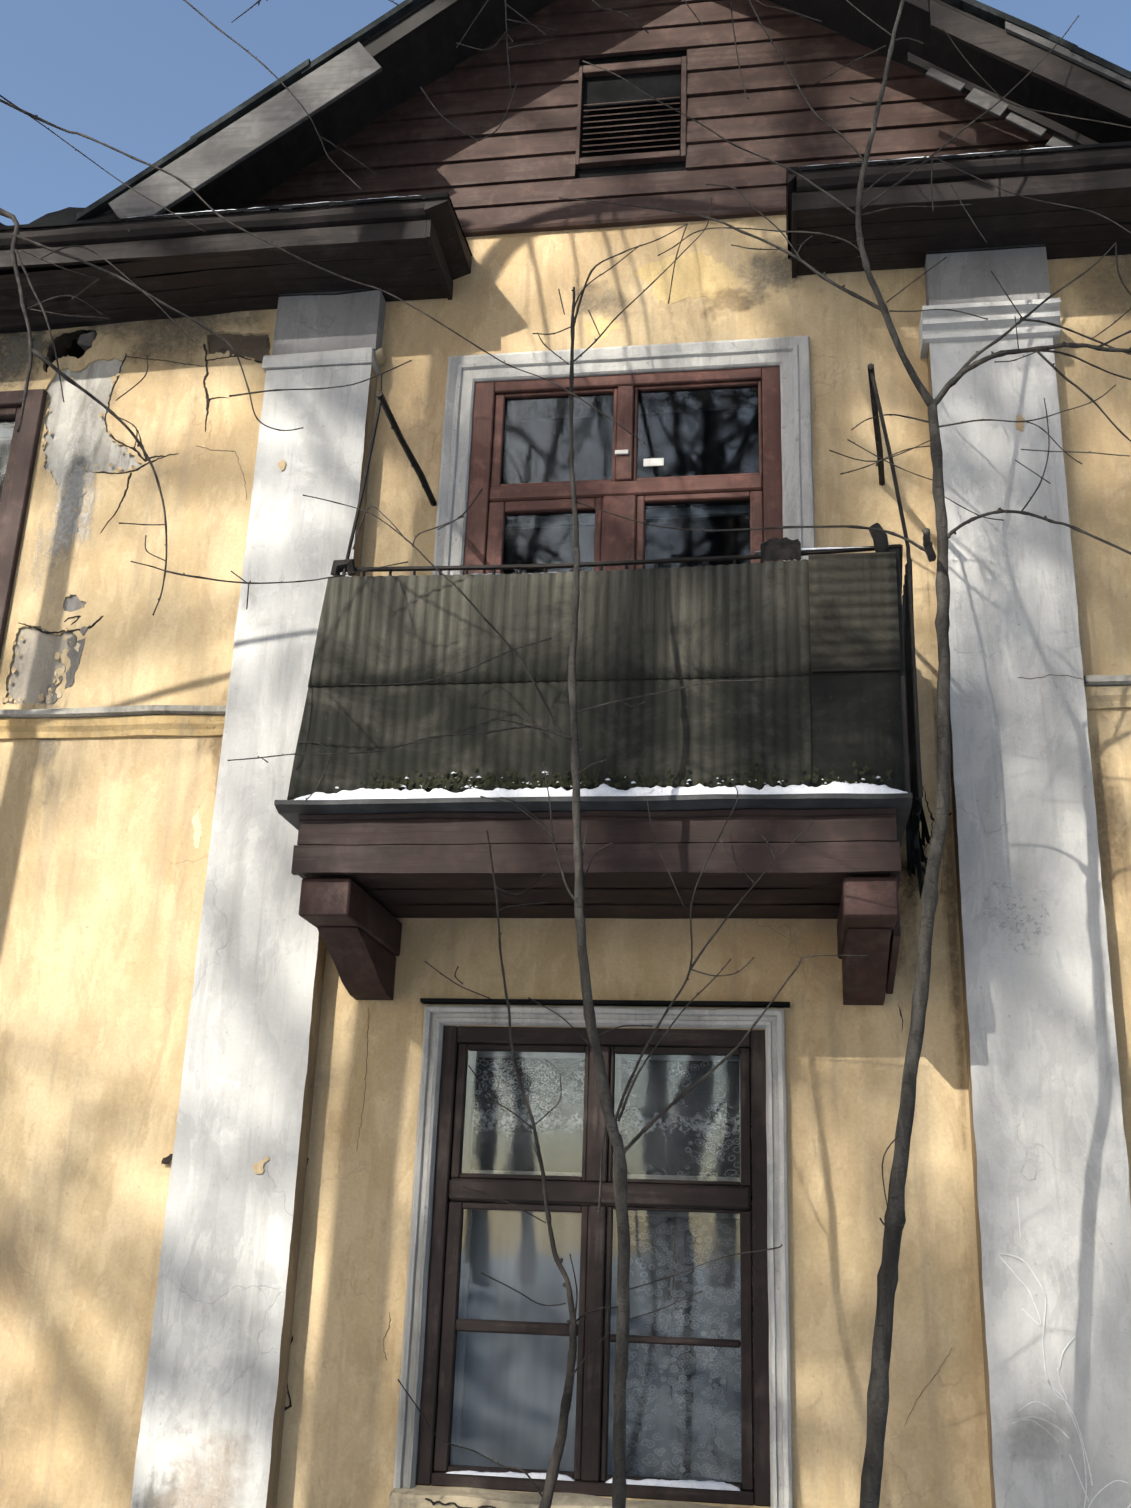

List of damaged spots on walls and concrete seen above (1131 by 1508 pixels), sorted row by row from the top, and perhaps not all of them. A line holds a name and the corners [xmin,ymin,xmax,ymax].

peeling [41,329,142,534]
crack [86,343,262,533]
spalling [2,593,88,708]
crack [425,1498,496,1508]